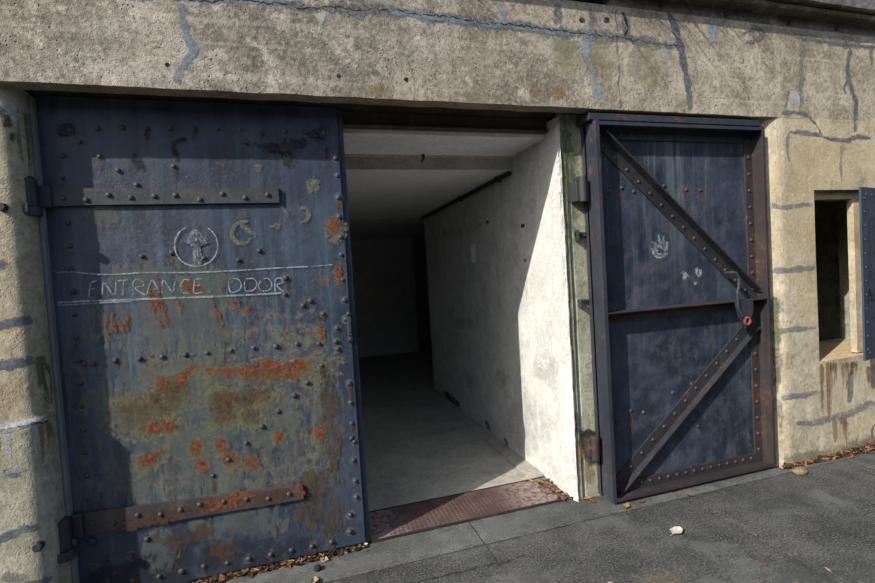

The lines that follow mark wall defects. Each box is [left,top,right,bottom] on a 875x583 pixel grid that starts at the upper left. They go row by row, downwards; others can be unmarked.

crack [172,0,692,106]
crack [782,34,875,176]
crack [0,315,32,329]
rust [103,307,131,339]
rust [147,275,183,328]
crack [0,356,36,371]
rust [820,361,871,419]
crack [0,416,49,433]
rust [114,357,349,550]
crack [0,525,39,543]
rust [153,484,256,569]
crack [26,575,52,583]